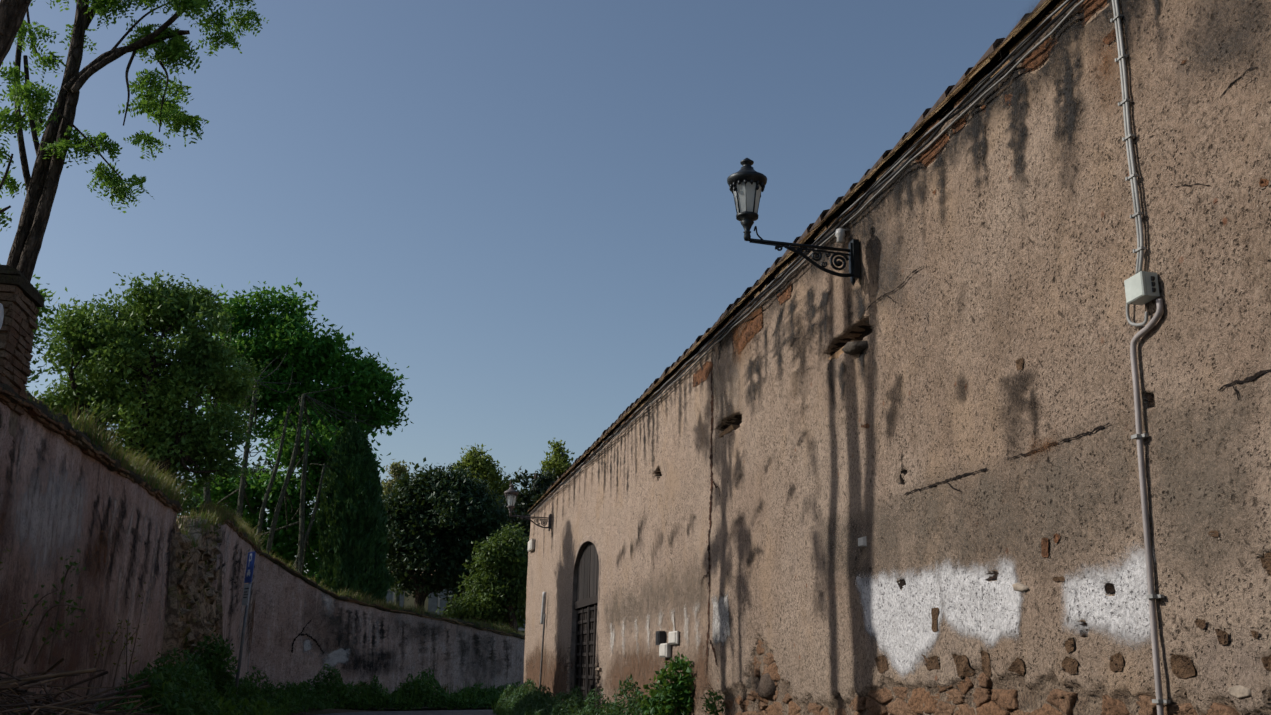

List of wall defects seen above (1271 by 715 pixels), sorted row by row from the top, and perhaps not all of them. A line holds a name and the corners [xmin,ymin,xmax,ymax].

water stain [534,0,1160,554]
water stain [0,429,173,697]
water stain [315,595,509,677]
crack [701,362,720,676]
flaking render [594,549,1271,715]
crack [901,422,1109,495]
crack [1218,369,1271,400]